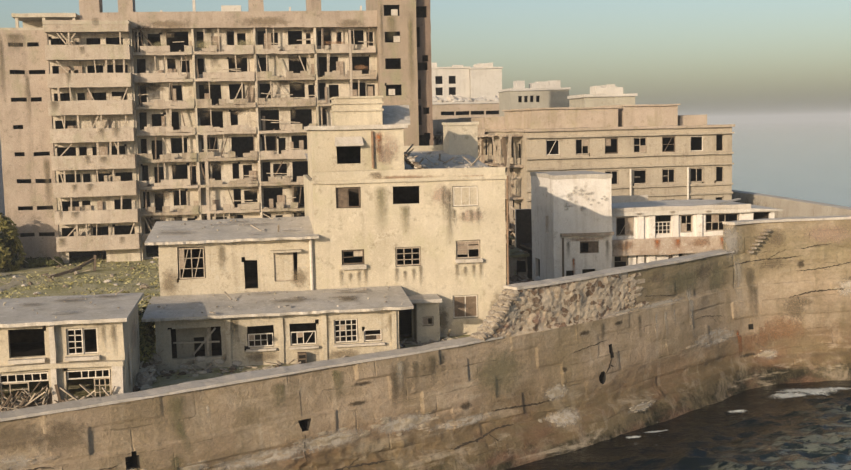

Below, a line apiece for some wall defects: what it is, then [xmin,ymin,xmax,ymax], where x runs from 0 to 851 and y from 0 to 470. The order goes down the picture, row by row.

crack [726,243,850,299]
spalling [470,289,520,341]
crack [335,458,396,470]